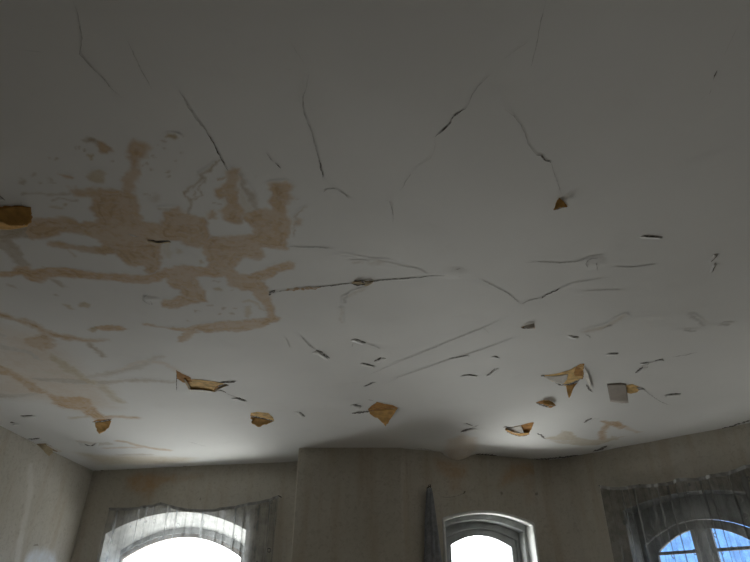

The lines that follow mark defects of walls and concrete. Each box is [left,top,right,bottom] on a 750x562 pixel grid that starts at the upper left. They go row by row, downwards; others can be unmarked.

crack [179,91,227,169]
crack [389,83,482,216]
water stain [0,131,309,343]
crack [269,283,352,295]
crack [351,254,460,282]
crack [478,264,654,304]
water stain [541,420,645,446]